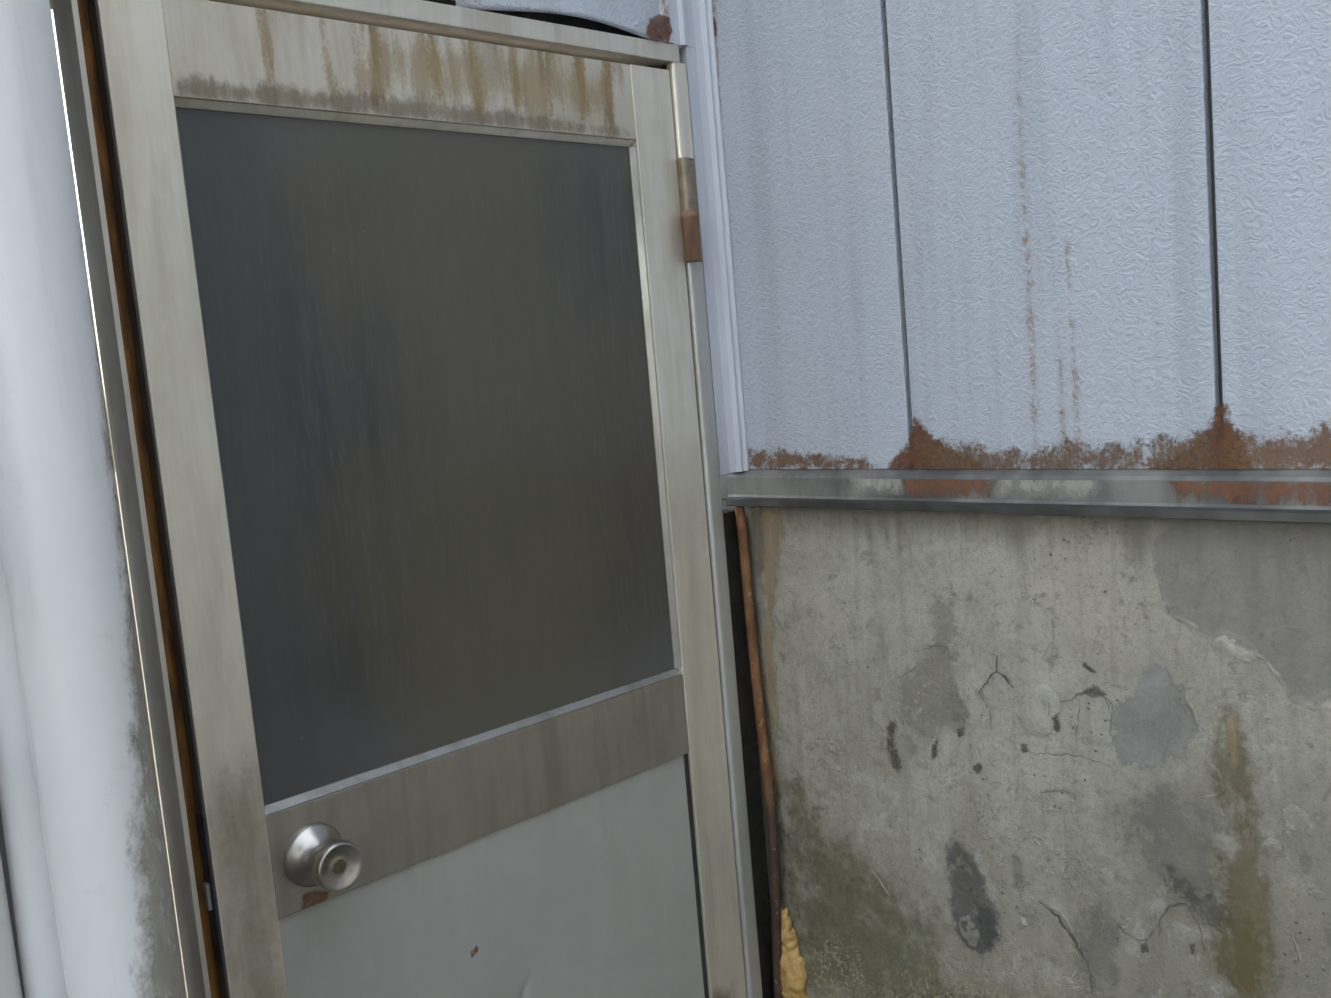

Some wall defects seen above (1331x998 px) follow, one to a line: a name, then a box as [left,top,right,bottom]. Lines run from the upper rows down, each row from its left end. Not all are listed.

rust [180,78,571,129]
rust [748,404,1331,506]
peeling [886,643,965,773]
crack [978,656,1013,725]
leakage [945,842,997,954]